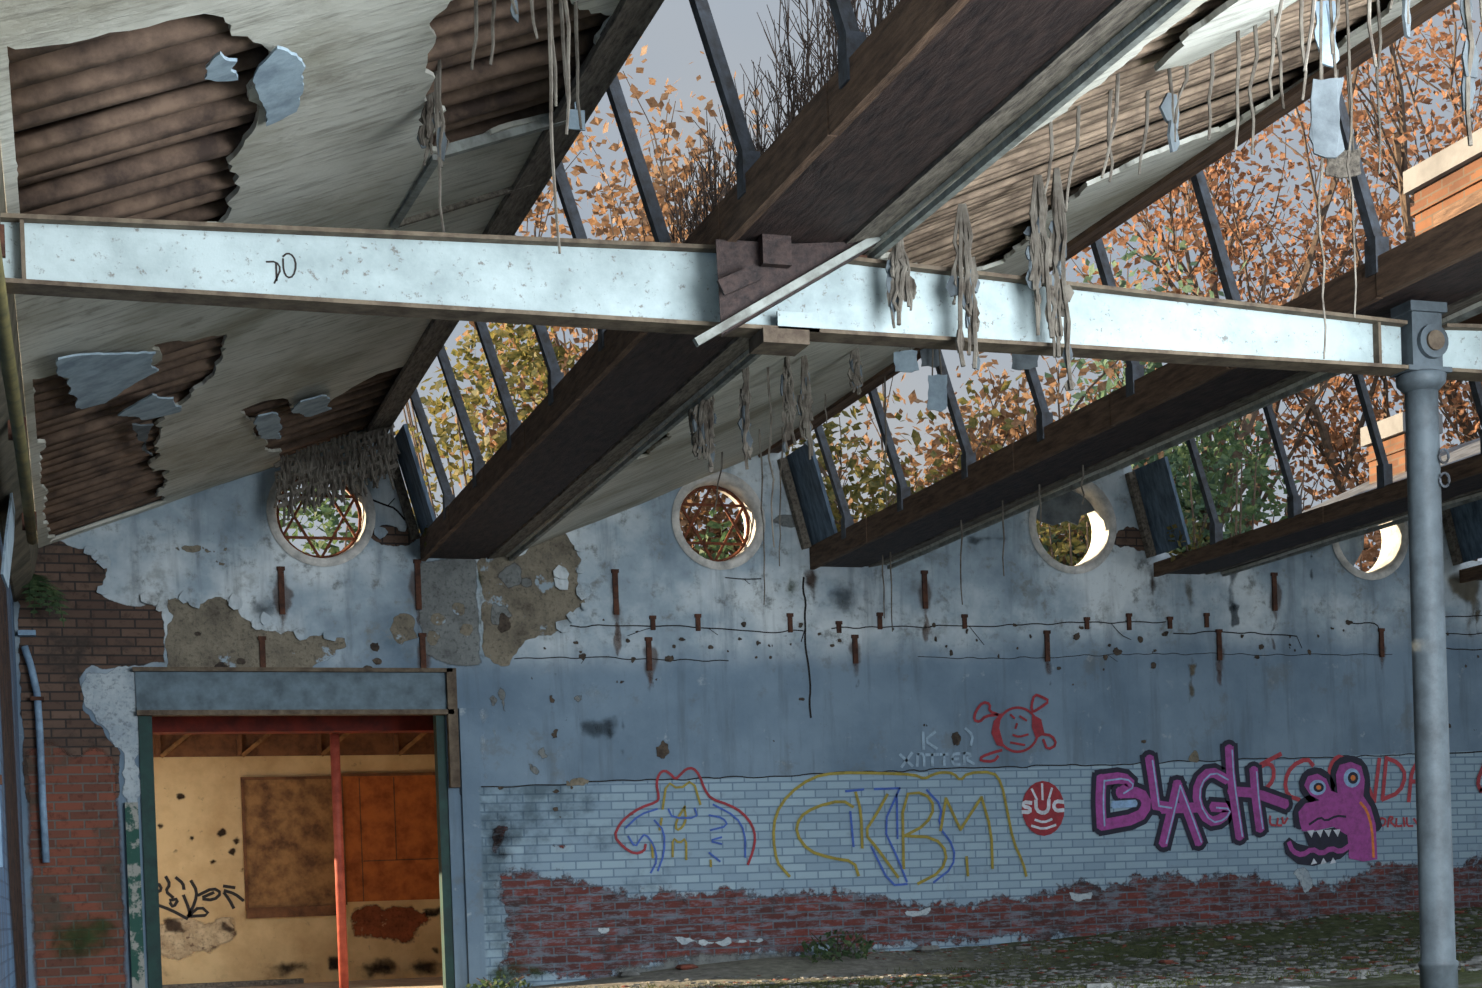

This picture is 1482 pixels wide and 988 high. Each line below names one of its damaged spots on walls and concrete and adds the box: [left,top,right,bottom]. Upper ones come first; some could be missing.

flaking render [510,0,519,23]
flaking render [1402,0,1411,39]
flaking render [1459,0,1479,111]
flaking render [205,46,305,127]
flaking render [1159,93,1180,153]
flaking render [56,351,182,456]
flaking render [253,395,332,439]
flaking render [0,541,346,988]
peeling [492,825,508,853]
peeling [1453,856,1482,909]
peeling [496,861,1419,980]